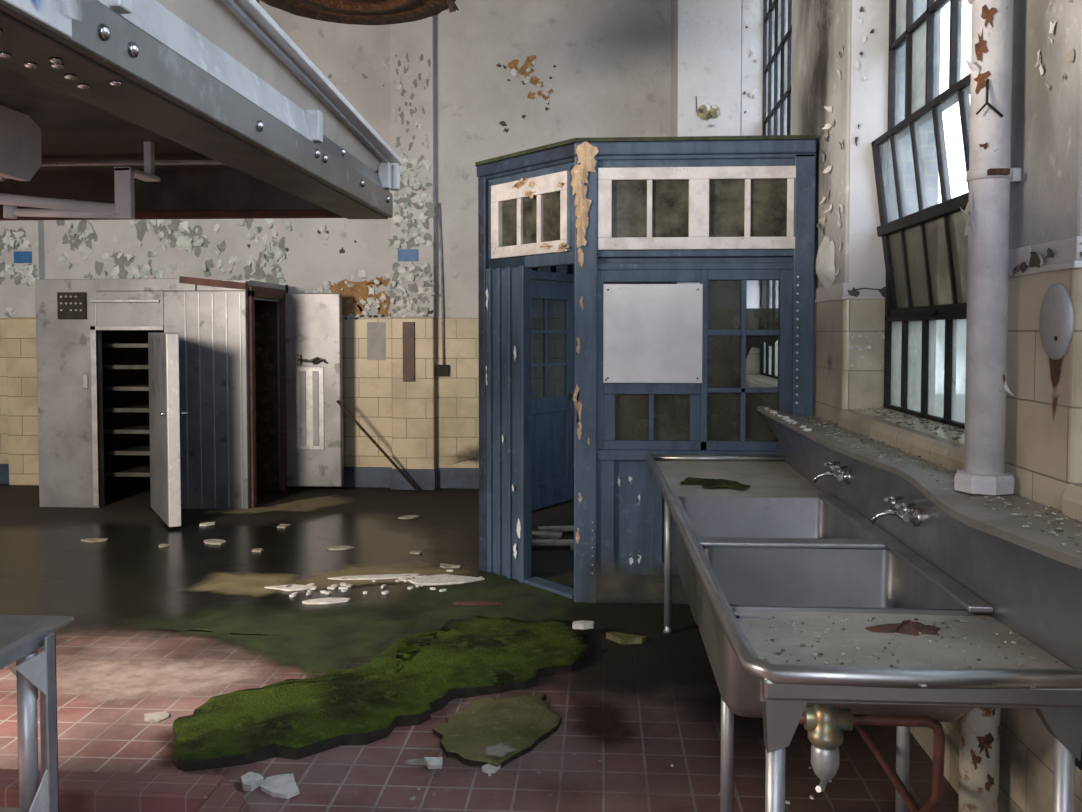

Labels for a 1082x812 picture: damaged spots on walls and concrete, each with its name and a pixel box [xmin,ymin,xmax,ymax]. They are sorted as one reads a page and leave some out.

rust [974,4,997,94]
peeling [496,55,557,111]
spalling [696,96,721,126]
peeling [382,53,435,249]
peeling [0,228,40,290]
peeling [56,219,291,284]
peeling [297,262,435,320]
peeling [573,385,590,446]
rust [1049,358,1061,416]
water stain [485,743,516,757]
rust [970,733,995,792]